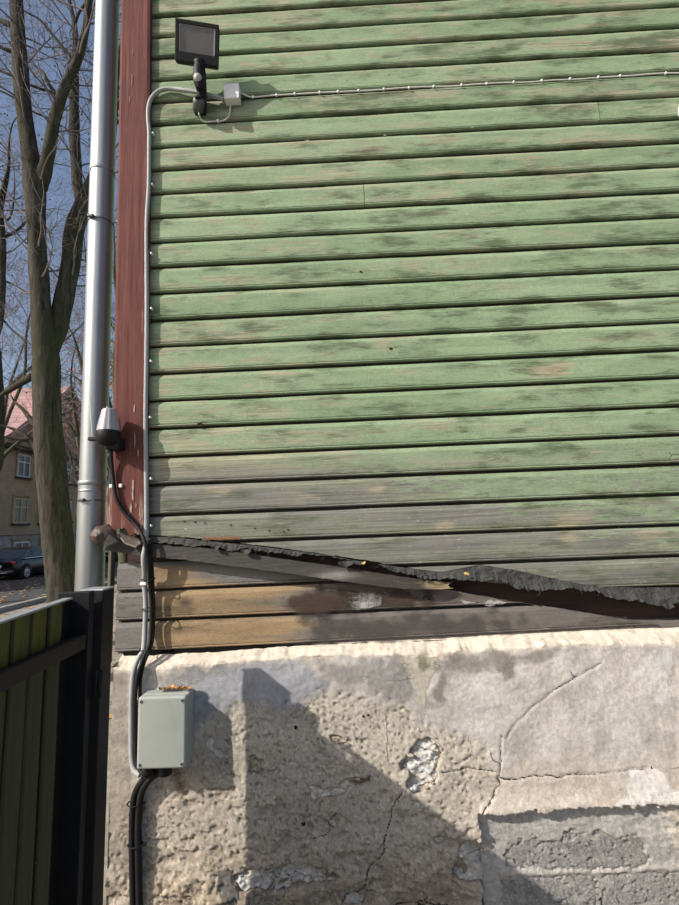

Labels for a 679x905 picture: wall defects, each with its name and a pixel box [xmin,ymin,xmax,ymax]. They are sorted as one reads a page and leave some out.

water stain [287,585,509,641]
water stain [323,657,443,715]
water stain [452,650,512,677]
water stain [525,648,555,661]
crack [443,663,642,814]
flaking render [400,737,443,792]
flaking render [308,775,370,801]
flaking render [235,864,337,905]
crack [341,792,402,904]
crack [394,896,448,905]
flaking render [453,839,486,885]